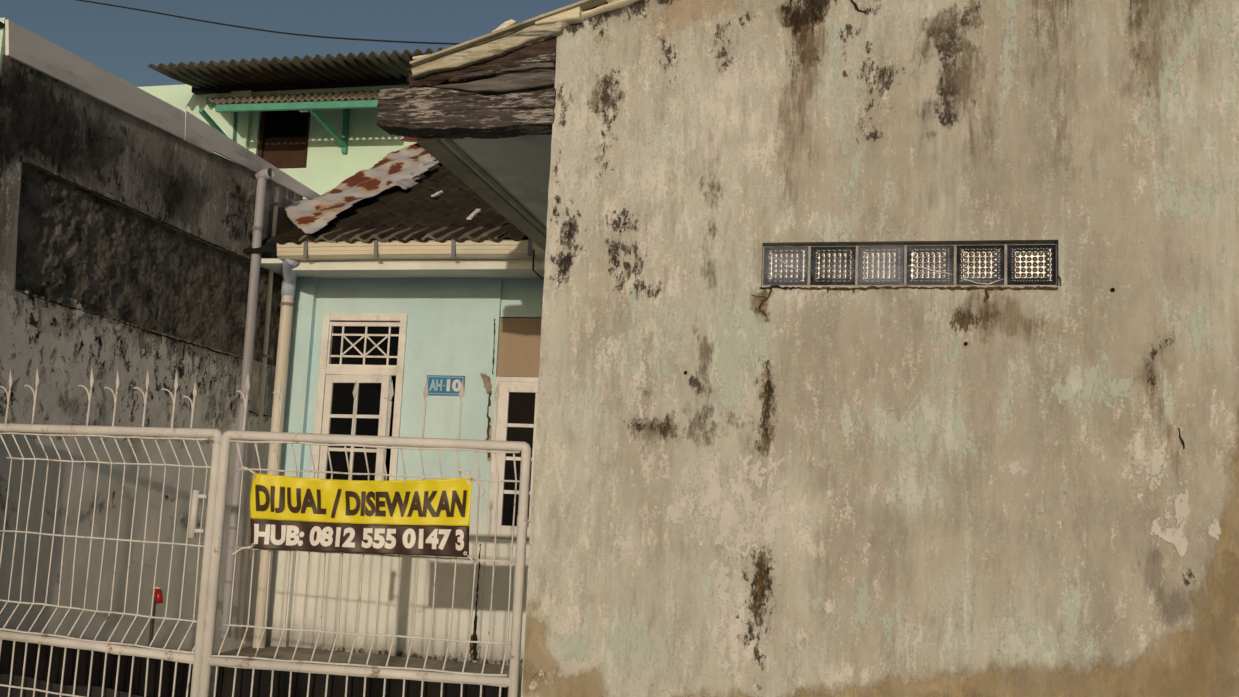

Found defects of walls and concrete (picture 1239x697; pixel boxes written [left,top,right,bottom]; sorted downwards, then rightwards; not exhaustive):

crack [790,0,880,15]
mould [590,67,623,183]
damp [914,0,981,153]
damp [547,149,583,289]
damp [606,208,661,300]
damp [688,336,712,393]
damp [1145,332,1176,420]
damp [310,607,603,697]
damp [736,549,774,697]
damp [795,448,1239,697]
peeling [1136,452,1190,557]
peeling [1208,518,1221,540]